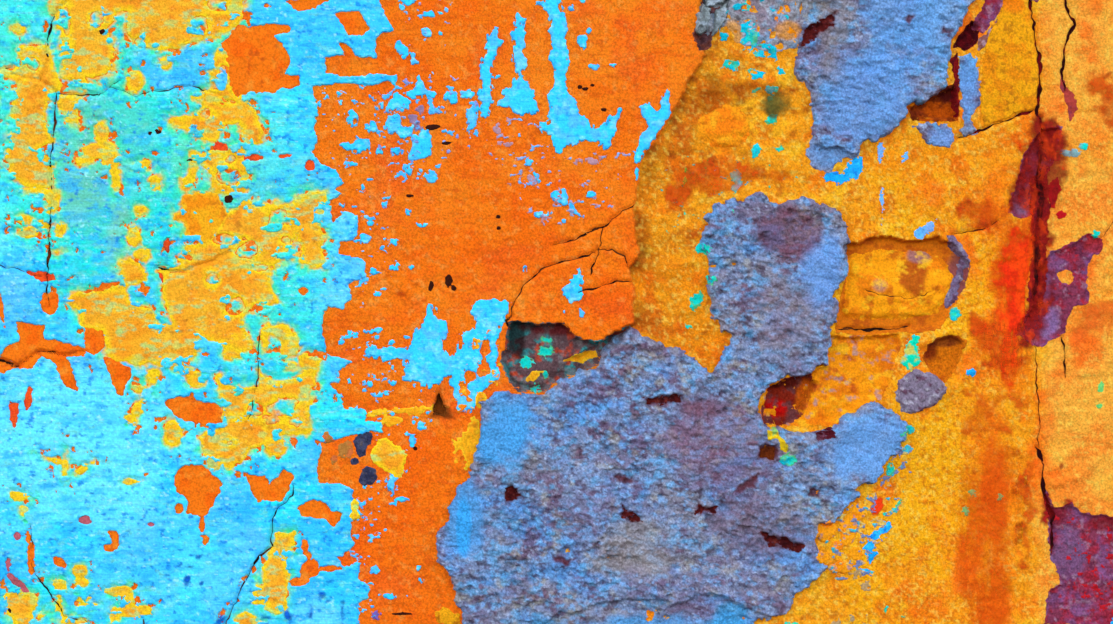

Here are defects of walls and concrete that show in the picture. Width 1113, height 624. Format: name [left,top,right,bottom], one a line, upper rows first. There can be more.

peeling [692,0,1039,179]
crack [0,351,85,367]
crack [0,80,228,301]
crack [248,335,260,419]
peeling [0,0,639,624]
crack [505,205,634,326]
peeling [435,170,971,624]
rust [957,198,993,231]
rust [970,115,1067,408]
crack [1033,337,1066,555]
crack [30,526,87,622]
crack [226,485,294,624]